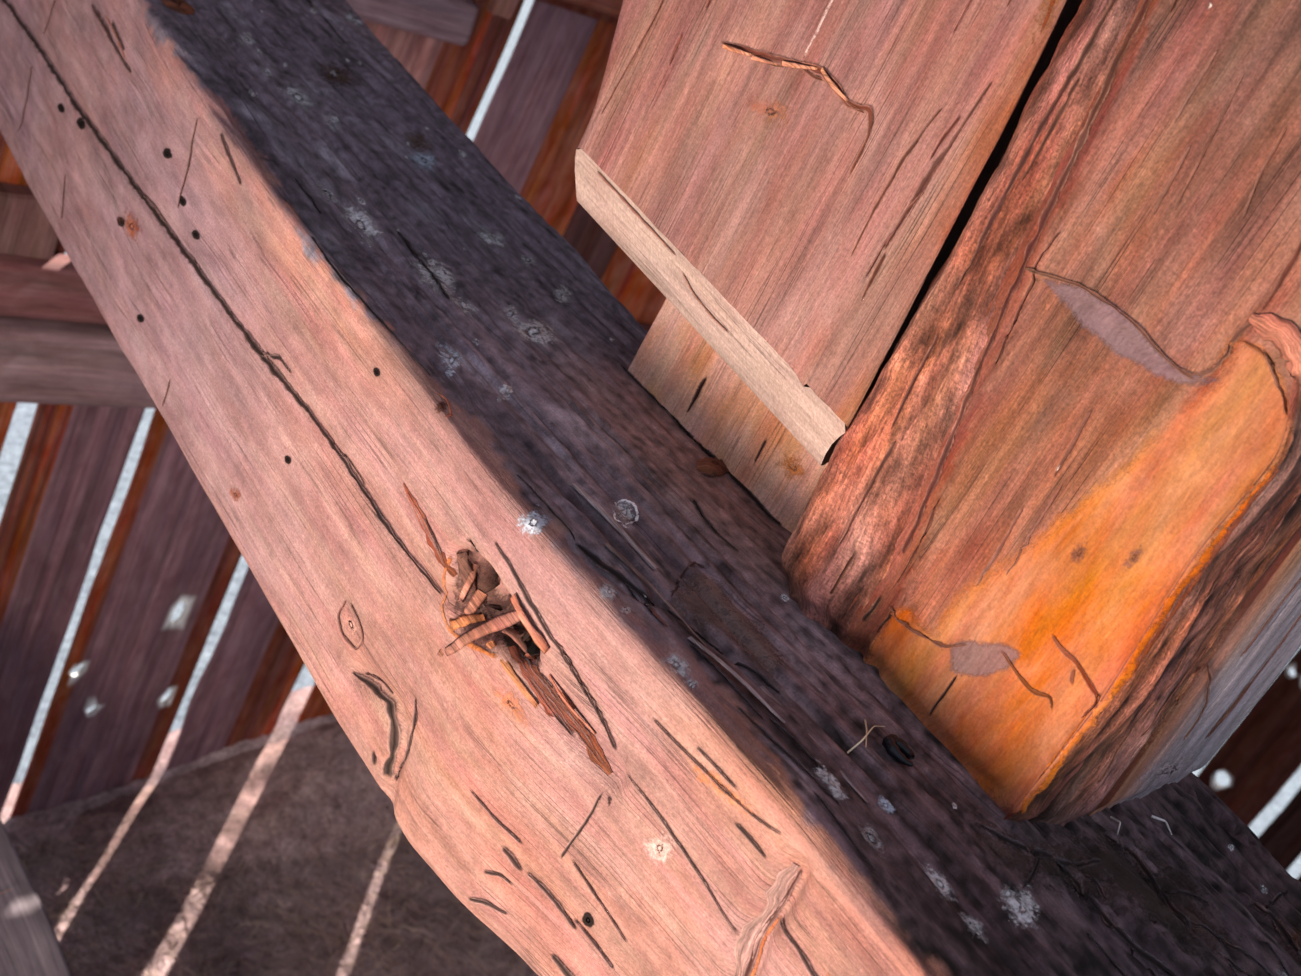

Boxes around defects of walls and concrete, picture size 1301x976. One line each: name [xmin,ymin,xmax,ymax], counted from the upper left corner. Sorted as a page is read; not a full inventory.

crack [1,0,441,594]
crack [396,230,449,299]
crack [852,0,1178,630]
spalling [500,621,540,661]
crack [830,333,939,594]
crack [930,677,956,716]
peeling [866,268,1301,813]